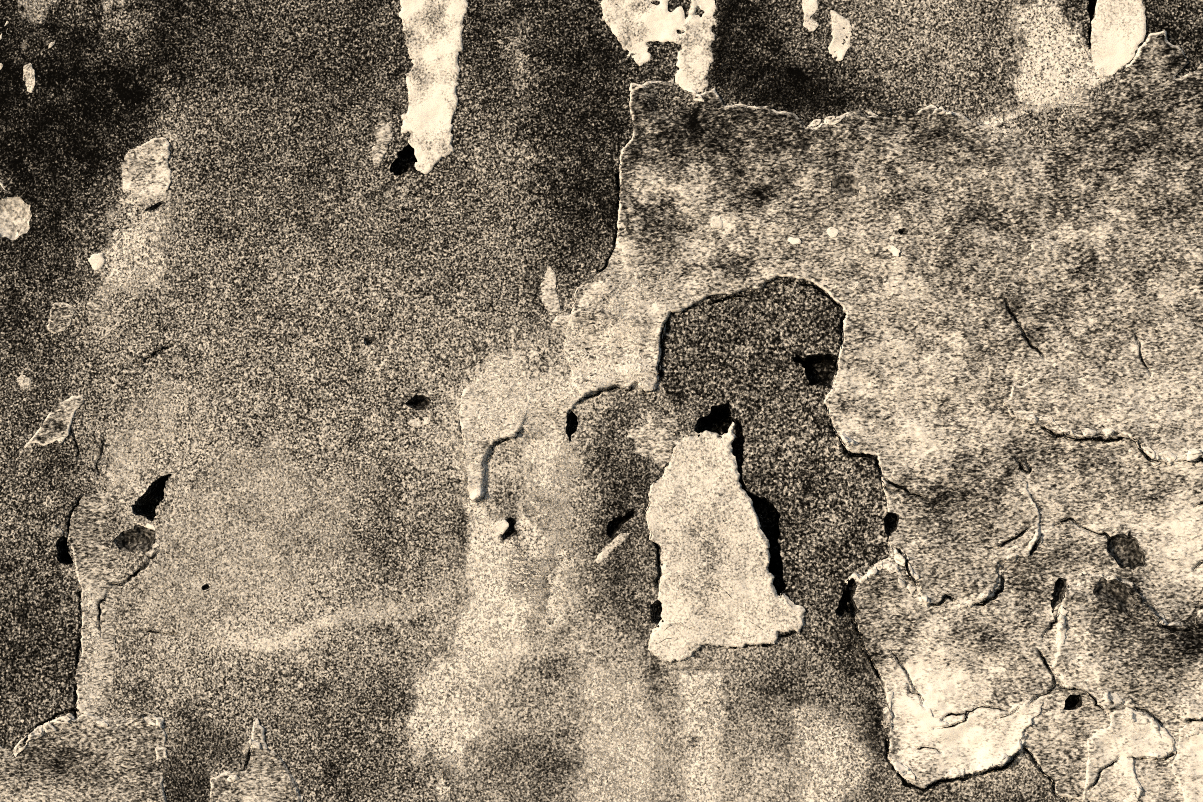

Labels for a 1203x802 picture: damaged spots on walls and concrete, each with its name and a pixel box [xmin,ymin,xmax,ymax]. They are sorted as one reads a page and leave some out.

peeling [371,0,468,176]
peeling [600,0,717,102]
peeling [1091,0,1146,77]
damp [98,196,171,294]
spalling [540,255,1042,662]
crack [881,475,923,498]
crack [896,548,919,587]
crack [993,518,1112,549]
flaking render [0,492,167,802]
crack [893,612,1104,753]
flaking render [881,685,1045,788]
crack [1089,756,1170,789]